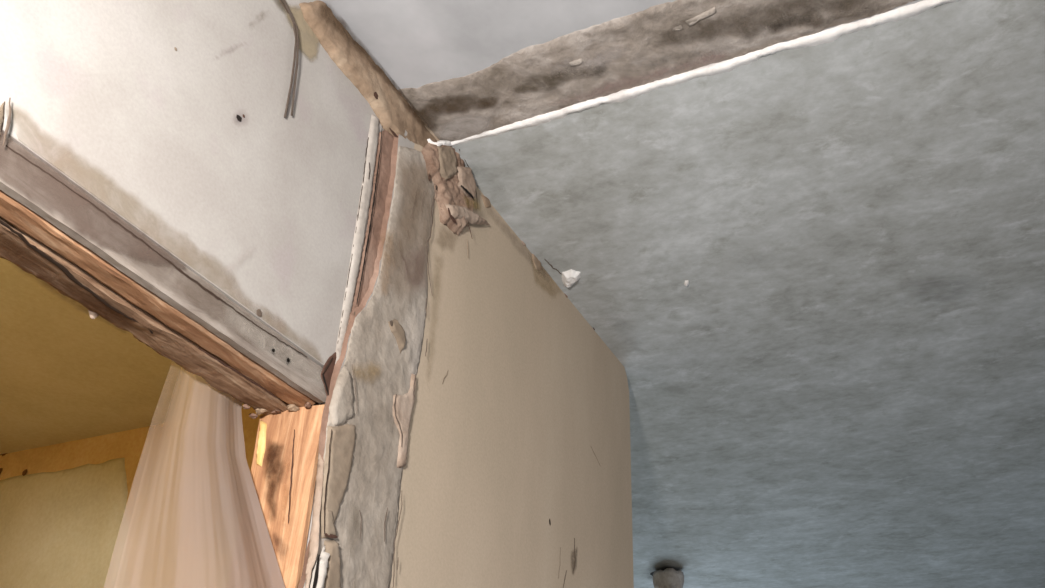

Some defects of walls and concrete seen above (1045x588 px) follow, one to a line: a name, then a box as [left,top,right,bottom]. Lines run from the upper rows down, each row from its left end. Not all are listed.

leakage [667,0,859,42]
leakage [515,57,604,92]
leakage [416,97,496,137]
flaking render [287,0,916,247]
spalling [388,319,406,354]
peeling [316,352,354,426]
spalling [392,374,416,468]
flaking render [310,508,341,588]